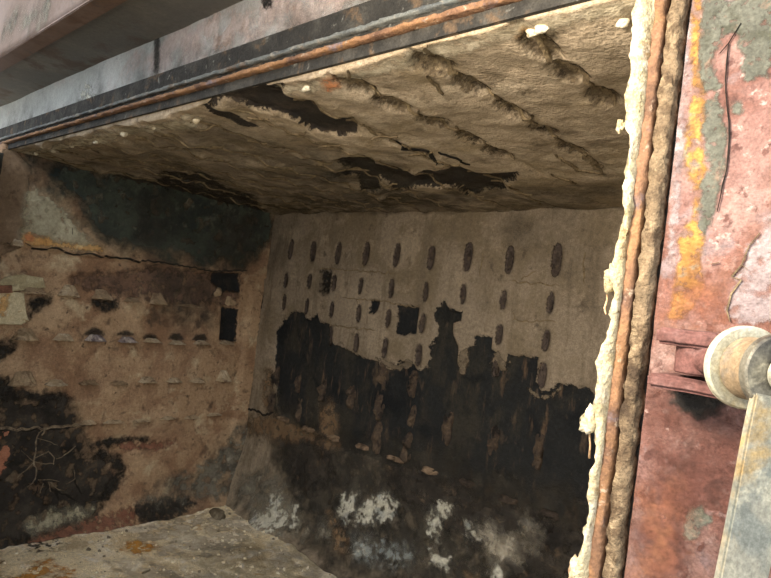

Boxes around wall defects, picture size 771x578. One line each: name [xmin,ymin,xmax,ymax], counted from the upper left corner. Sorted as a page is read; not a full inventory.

corrosion [204,0,344,50]
spalling [203,82,358,136]
corrosion [664,0,722,319]
crack [7,228,247,272]
peeling [247,0,655,578]
peeling [0,431,10,474]
crack [0,423,85,501]
water stain [26,450,126,531]
efflorescence [337,494,398,525]
efflorescence [426,502,451,535]
corrosion [635,413,743,578]
efflorescence [428,548,452,573]